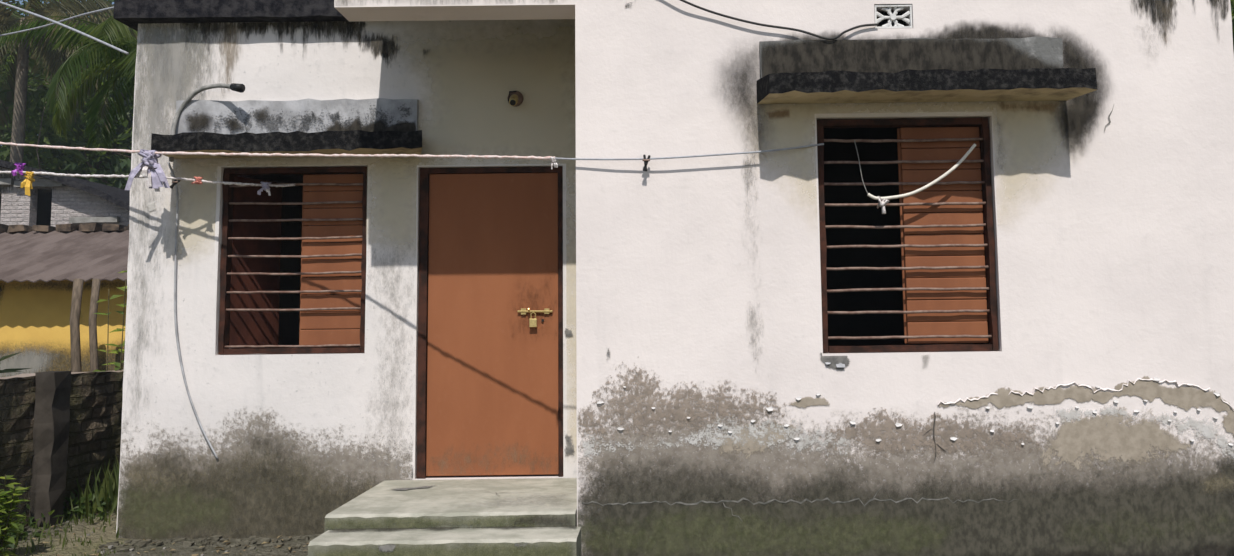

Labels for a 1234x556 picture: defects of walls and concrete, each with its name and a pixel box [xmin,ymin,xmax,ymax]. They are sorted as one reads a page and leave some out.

damp [1136,0,1176,36]
damp [133,21,416,150]
damp [731,24,1104,145]
spalling [821,353,850,370]
damp [117,408,413,540]
damp [515,400,1234,556]
peeling [825,376,1234,472]